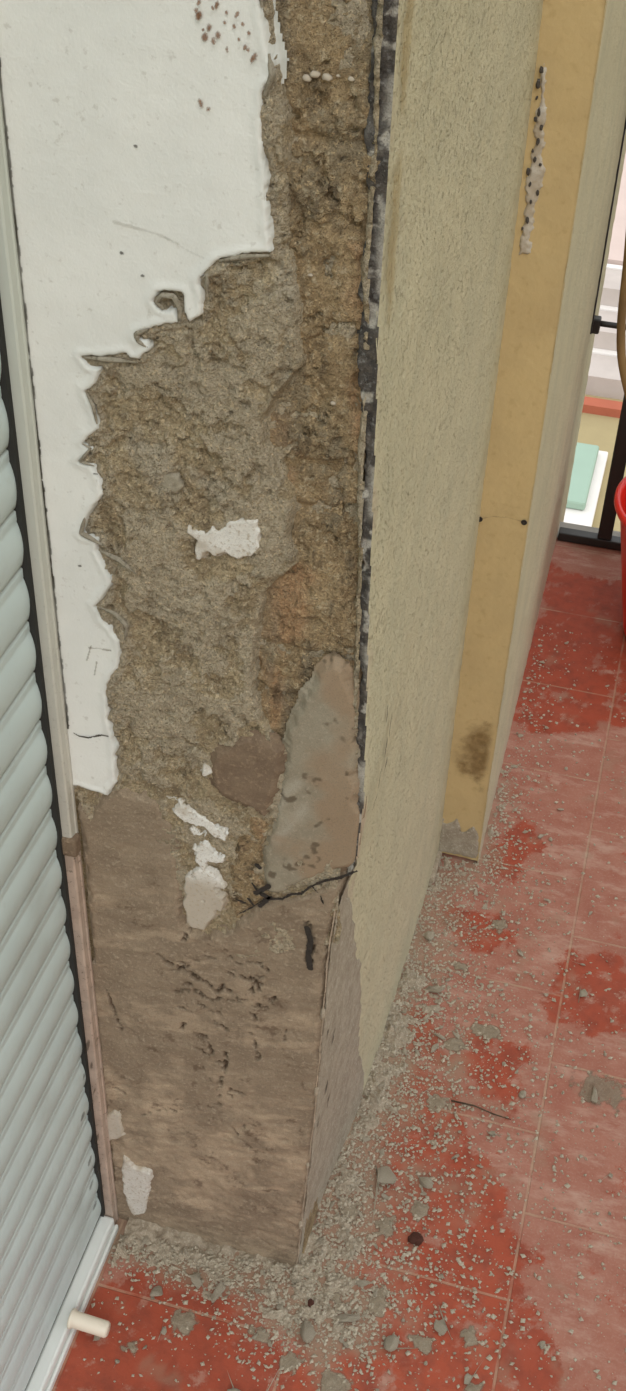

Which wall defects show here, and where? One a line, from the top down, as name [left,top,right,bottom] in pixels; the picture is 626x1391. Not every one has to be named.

flaking render [74,0,399,952]
flaking render [168,921,310,1018]
crack [236,863,358,971]